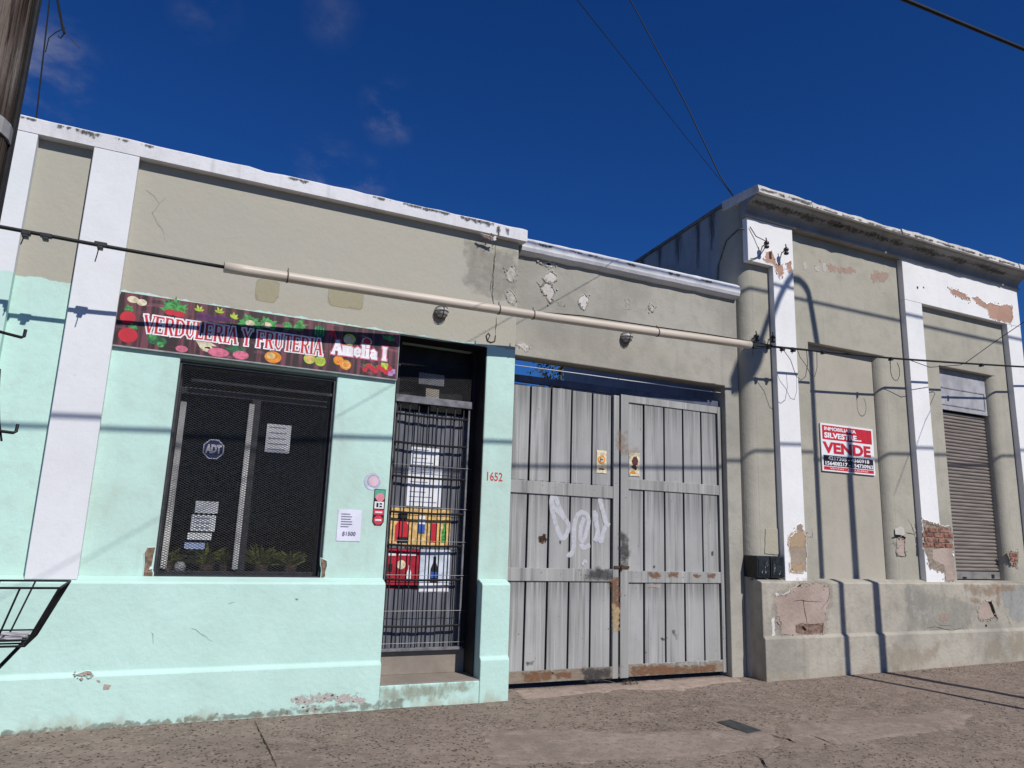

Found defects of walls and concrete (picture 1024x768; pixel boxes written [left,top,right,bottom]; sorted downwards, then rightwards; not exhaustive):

peeling [762,250,856,279]
peeling [537,259,558,306]
peeling [577,292,591,311]
peeling [947,287,1014,324]
spalling [894,518,956,582]
spalling [771,523,832,637]
corrosion [611,577,620,631]
spalling [977,600,998,622]
spalling [74,670,111,690]
corrosion [525,671,571,682]
corrosion [632,664,715,676]
peeling [291,692,365,712]